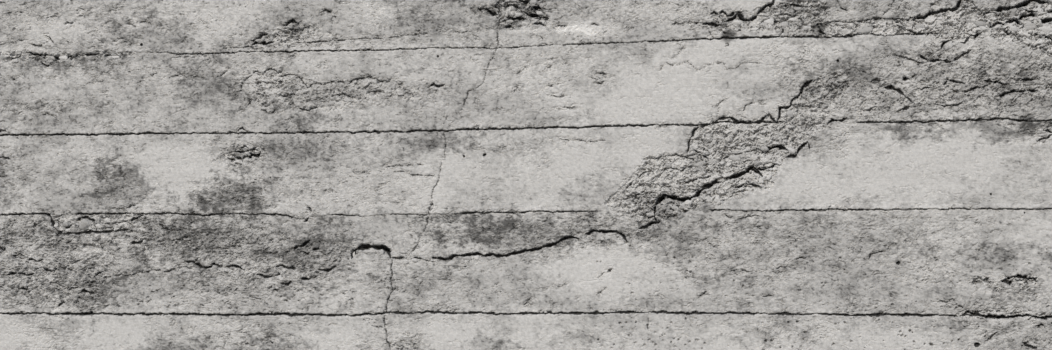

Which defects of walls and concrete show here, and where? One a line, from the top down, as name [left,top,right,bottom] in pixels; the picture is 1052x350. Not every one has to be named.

crack [296,31,466,43]
crack [351,0,642,347]
peeling [478,0,565,30]
spalling [601,0,1052,231]